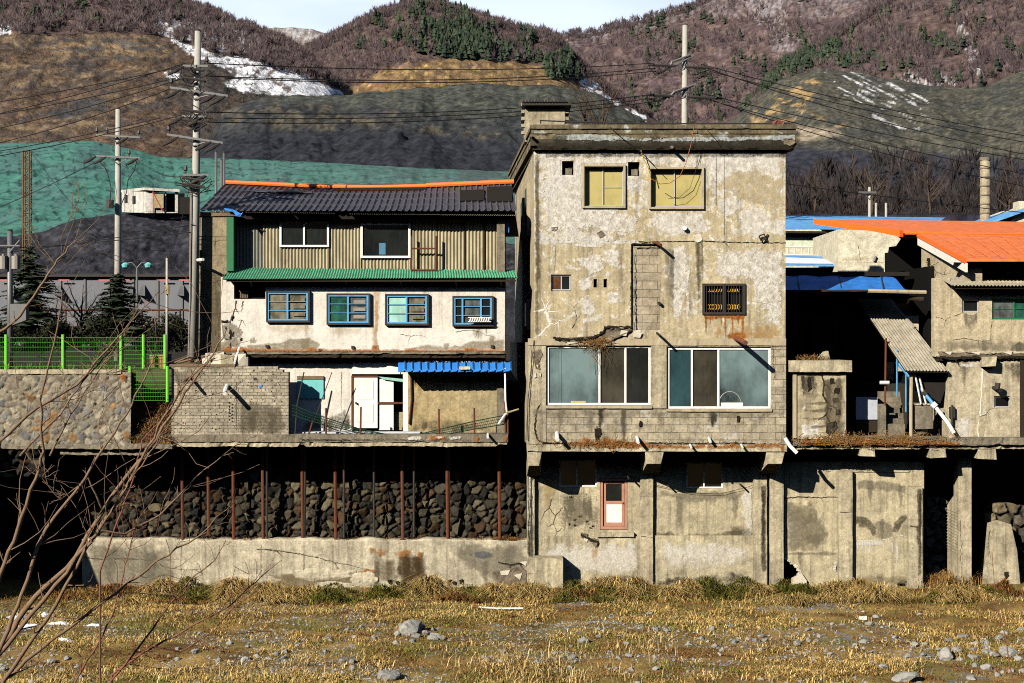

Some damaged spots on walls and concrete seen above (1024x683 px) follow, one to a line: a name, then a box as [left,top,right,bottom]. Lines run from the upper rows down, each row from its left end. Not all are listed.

peeling [534,131,796,344]
peeling [202,316,257,366]
crack [530,239,786,444]
corrosion [705,315,775,339]
crack [629,289,1024,448]
crack [542,498,599,546]
water stain [787,503,835,565]
water stain [856,481,922,575]